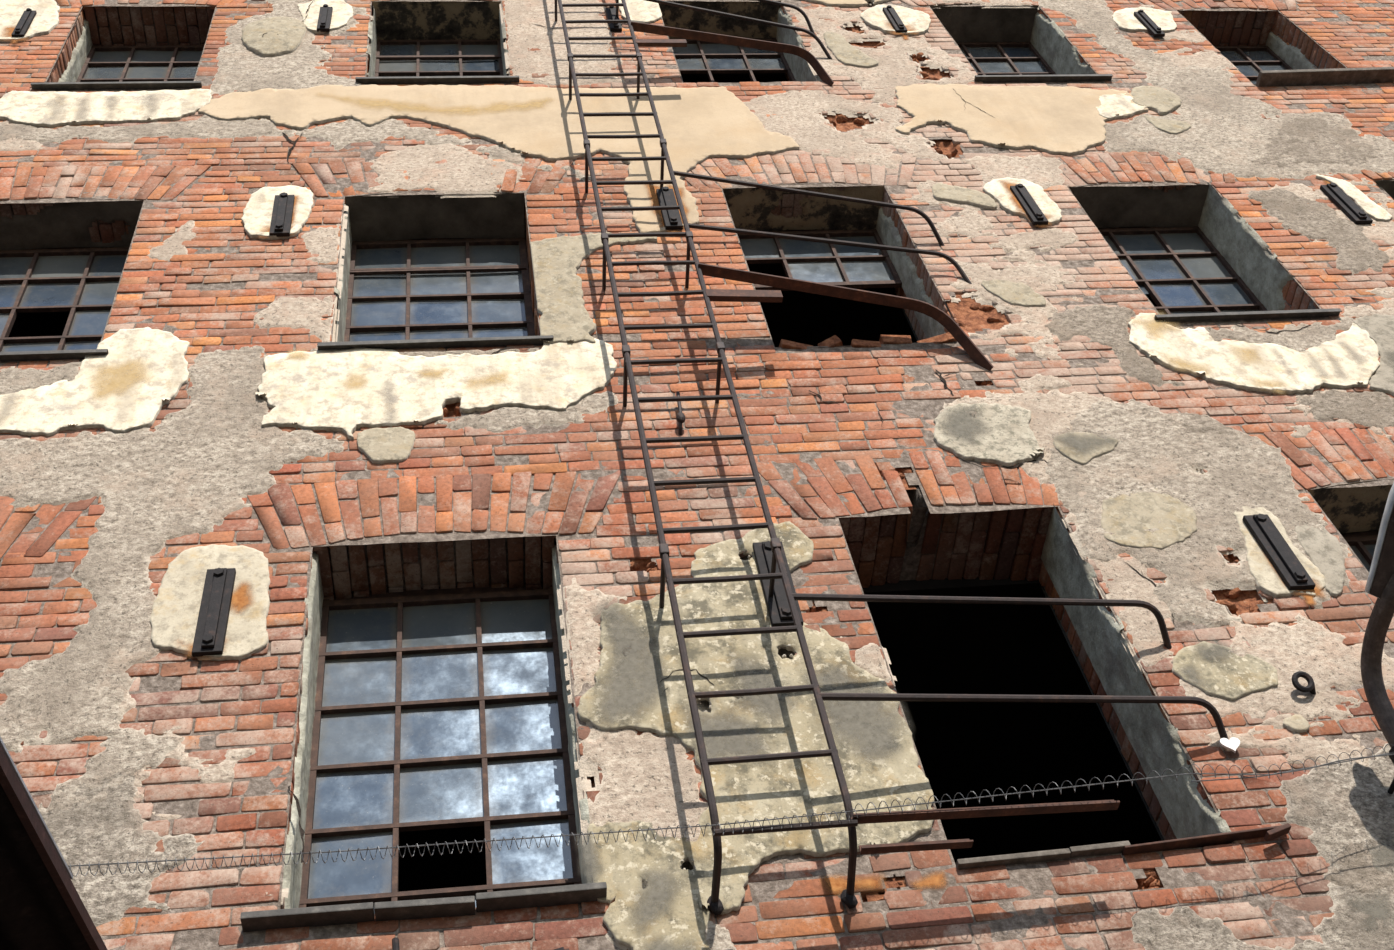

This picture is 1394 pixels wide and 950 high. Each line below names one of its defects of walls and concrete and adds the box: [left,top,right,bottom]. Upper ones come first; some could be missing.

peeling [253,205,348,342]
peeling [0,233,618,927]
peeling [557,521,934,950]
spalling [874,462,929,548]
peeling [905,180,1394,439]
peeling [933,374,1394,950]